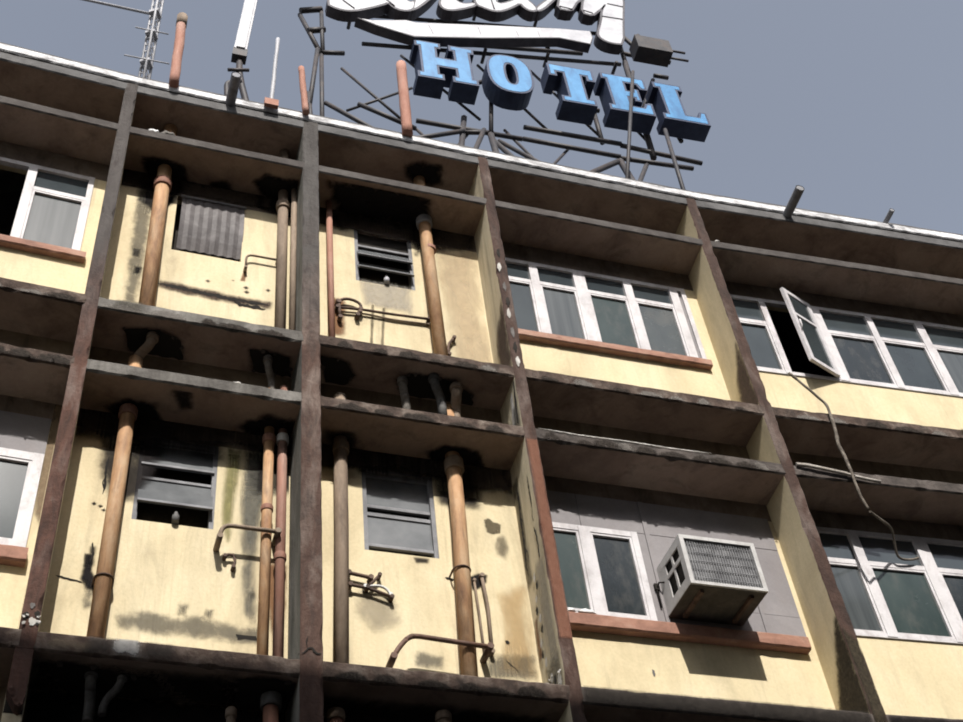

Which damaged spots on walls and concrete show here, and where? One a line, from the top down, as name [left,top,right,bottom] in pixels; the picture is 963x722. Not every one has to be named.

damp [115,190,152,311]
damp [223,449,263,615]
damp [56,542,95,606]
damp [84,637,173,658]
damp [120,606,257,642]